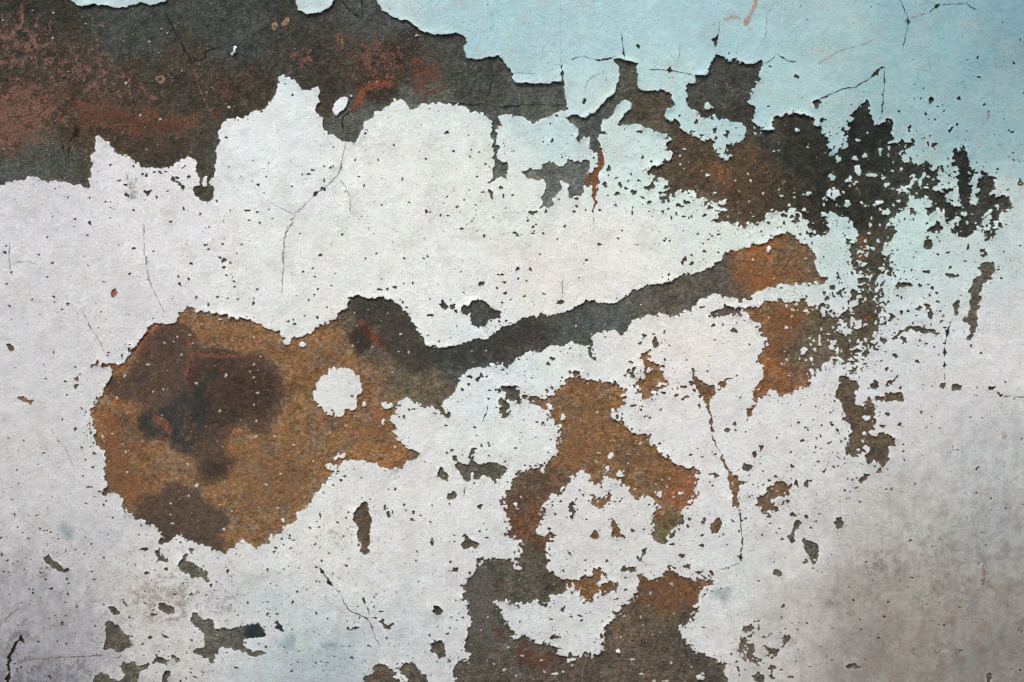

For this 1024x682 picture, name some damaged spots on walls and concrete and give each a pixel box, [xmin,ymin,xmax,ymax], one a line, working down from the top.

crack [900,0,976,45]
corrosion [0,1,236,162]
corrosion [335,31,448,112]
crack [811,66,885,112]
corrosion [584,149,604,213]
crack [717,509,743,572]